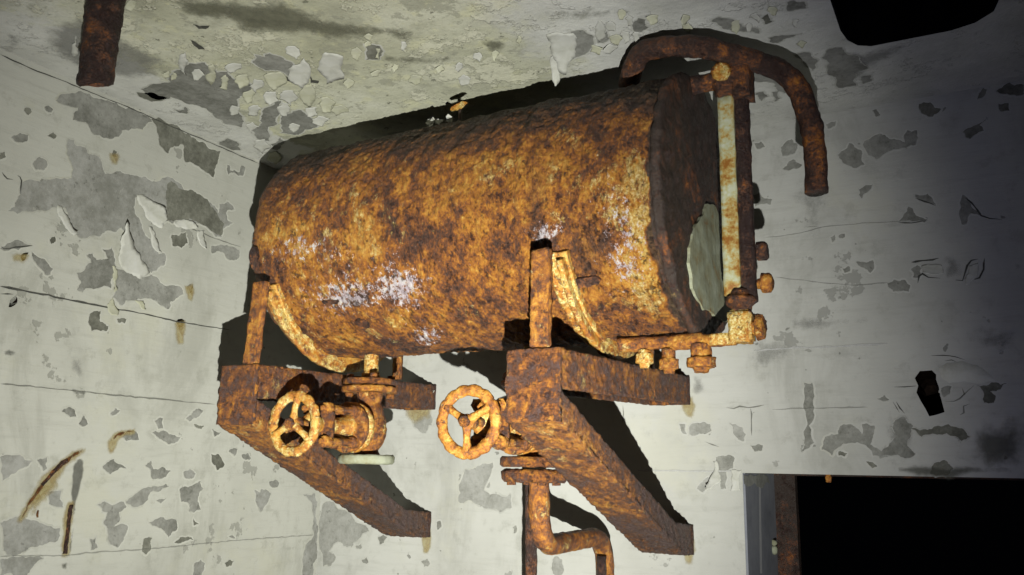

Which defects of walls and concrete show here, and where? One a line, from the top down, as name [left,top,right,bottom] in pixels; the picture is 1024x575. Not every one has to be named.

peeling [792,46,874,89]
peeling [836,128,920,170]
peeling [0,33,399,333]
crack [913,258,985,281]
corrosion [176,323,185,343]
peeling [101,457,128,476]
corrosion [109,430,134,452]
peeling [210,447,252,472]
peeling [800,370,972,470]
peeling [0,451,83,575]
peeling [89,460,204,557]
peeling [253,478,280,513]